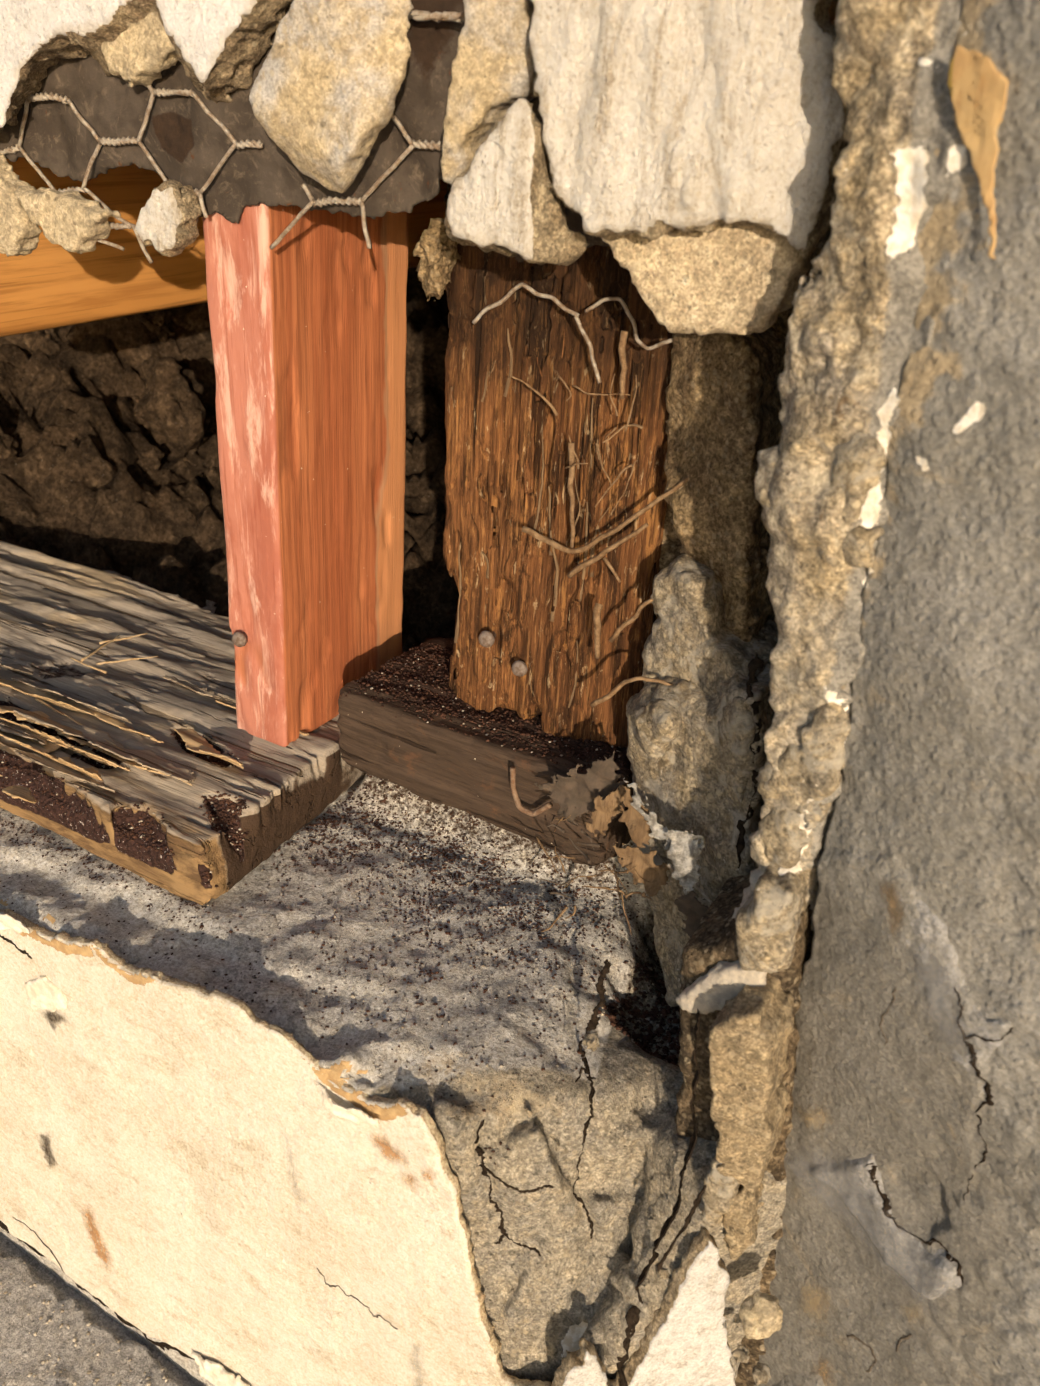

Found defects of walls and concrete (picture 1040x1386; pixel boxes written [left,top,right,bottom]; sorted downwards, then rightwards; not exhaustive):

peeling [945,144,968,177]
peeling [855,481,885,528]
peeling [798,798,832,850]
spalling [675,961,767,1015]
crack [474,960,611,1256]
crack [954,987,1013,1196]
spalling [302,1048,787,1383]
crack [616,1008,707,1386]
crack [866,1163,964,1284]